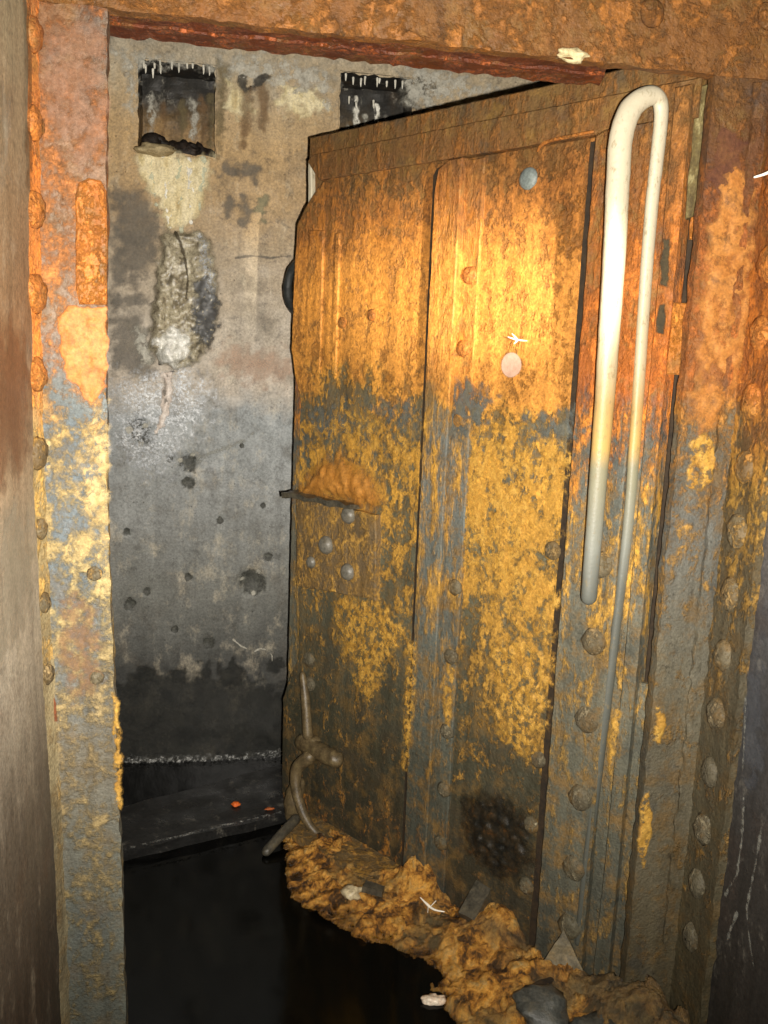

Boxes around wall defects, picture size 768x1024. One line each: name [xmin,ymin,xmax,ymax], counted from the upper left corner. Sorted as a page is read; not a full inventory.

leakage [108,50,331,307]
rust [57,305,109,403]
rust [656,305,666,334]
rust [660,239,670,286]
rust [691,167,755,435]
leakage [233,639,285,673]
leakage [116,659,287,763]
rust [461,794,534,879]